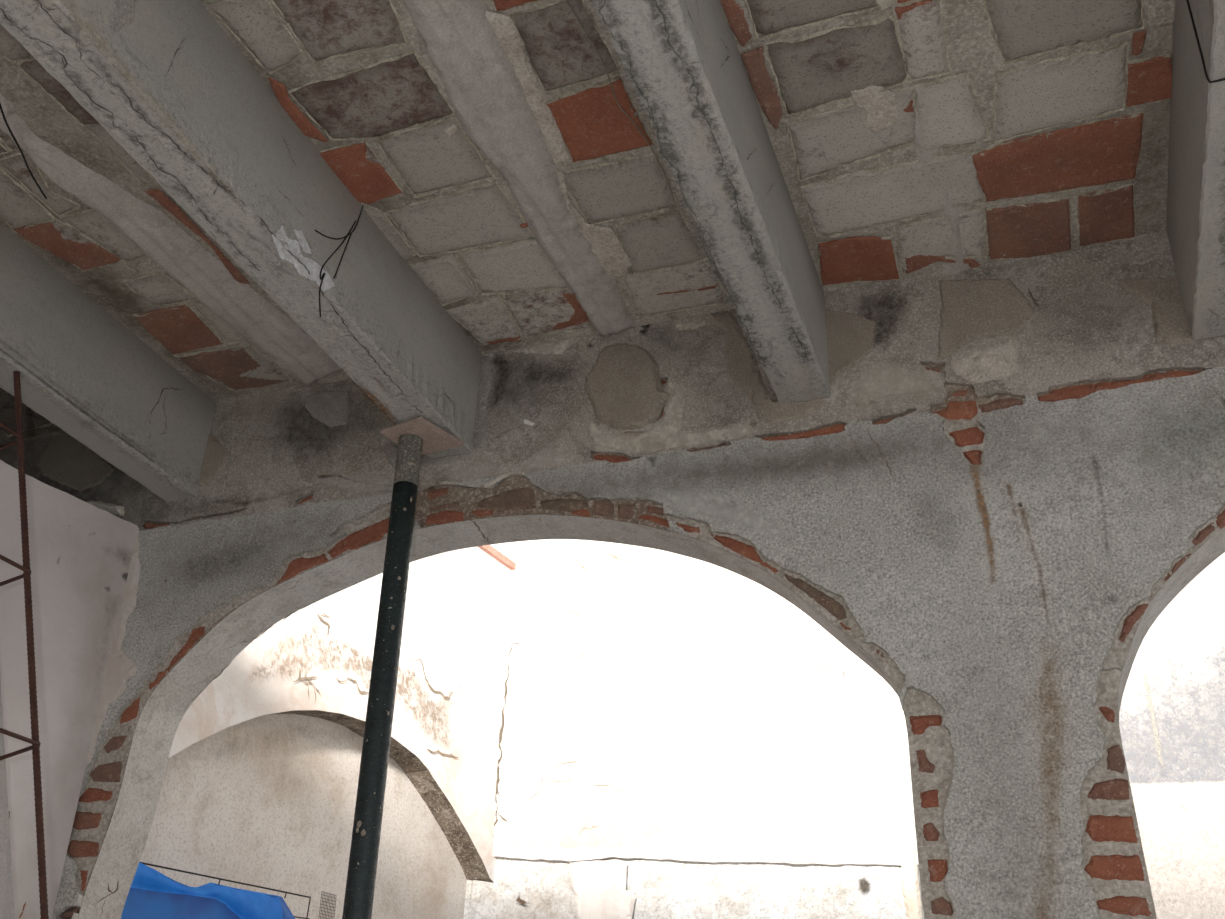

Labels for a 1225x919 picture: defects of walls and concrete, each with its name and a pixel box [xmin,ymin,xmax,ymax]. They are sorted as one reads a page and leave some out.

crack [0,1,455,420]
flaking render [761,423,846,441]
rust [972,466,994,579]
flaking render [931,370,1202,465]
flaking render [13,371,391,919]
flaking render [397,658,462,758]
crack [493,642,538,839]
flaking render [415,476,955,919]
flaking render [1080,505,1225,919]